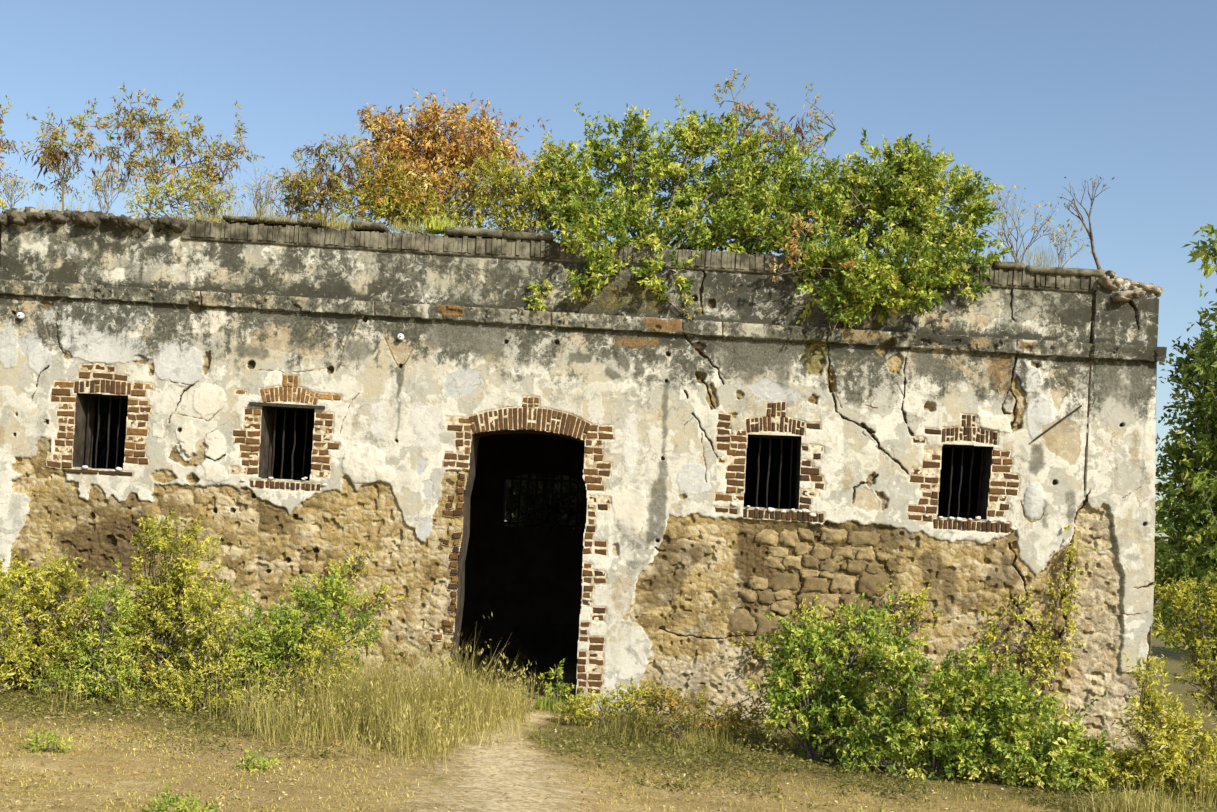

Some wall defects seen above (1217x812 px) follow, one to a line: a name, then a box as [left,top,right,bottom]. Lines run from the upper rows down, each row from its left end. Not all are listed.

flaking render [150,428,227,485]
crack [168,370,226,462]
water stain [242,306,295,325]
flaking render [342,475,354,498]
peeling [416,516,432,542]
crack [682,271,738,482]
water stain [713,307,844,386]
crack [826,337,918,474]
crack [1001,289,1019,429]
crack [1008,290,1140,645]